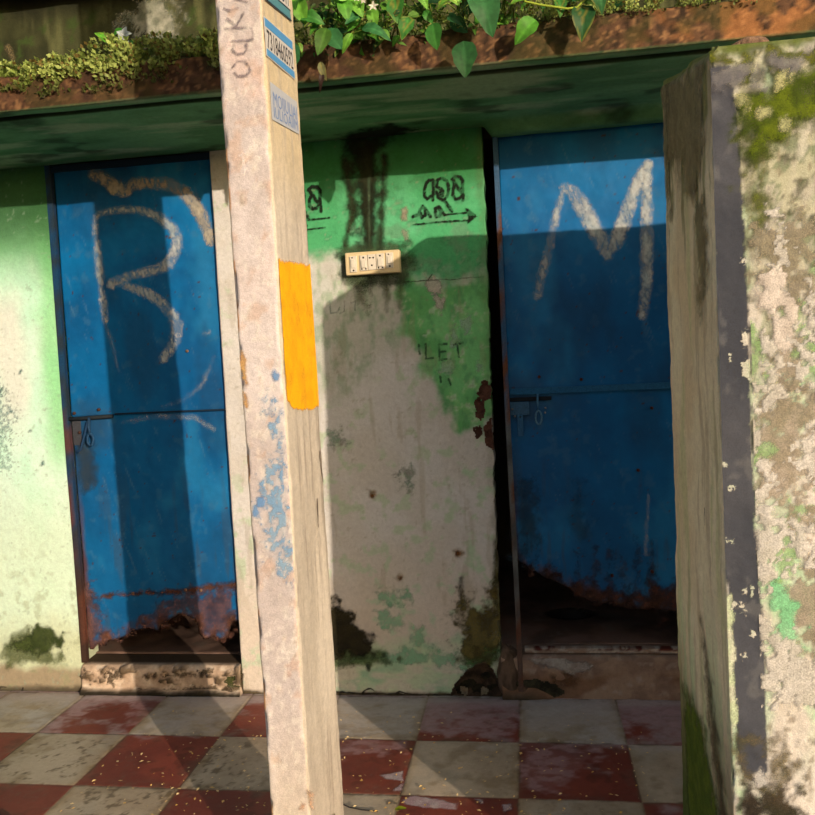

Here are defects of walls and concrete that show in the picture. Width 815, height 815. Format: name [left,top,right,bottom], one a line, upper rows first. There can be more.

damp [336,123,418,304]
peeling [473,364,494,450]
peeling [727,201,815,726]
damp [1,623,64,669]
corrosion [84,582,237,649]
damp [331,596,402,671]
damp [450,552,501,669]
corrosion [528,565,677,625]